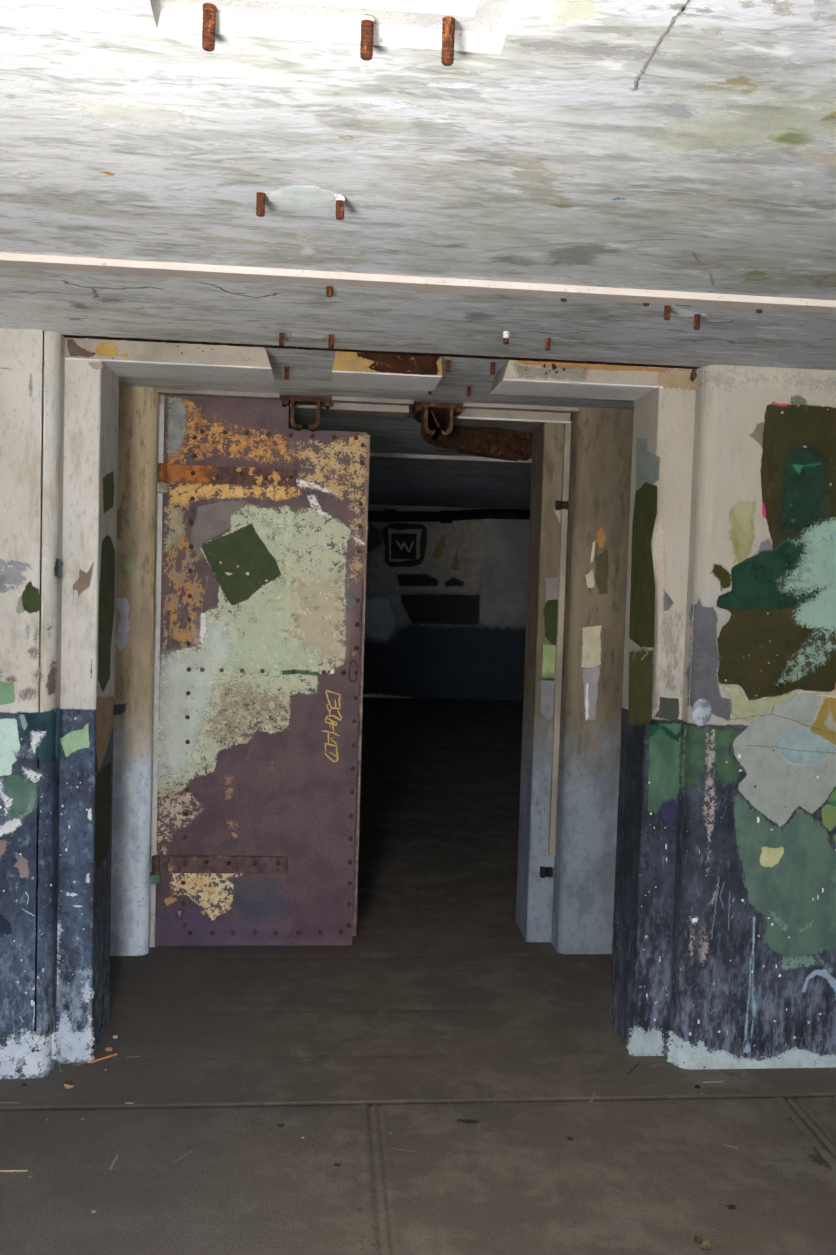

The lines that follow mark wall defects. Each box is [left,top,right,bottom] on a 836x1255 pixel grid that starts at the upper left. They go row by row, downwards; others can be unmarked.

crack [633,0,690,91]
corrosion [62,334,701,390]
corrosion [160,397,371,650]
damp [0,969,95,1079]
damp [627,917,836,1070]